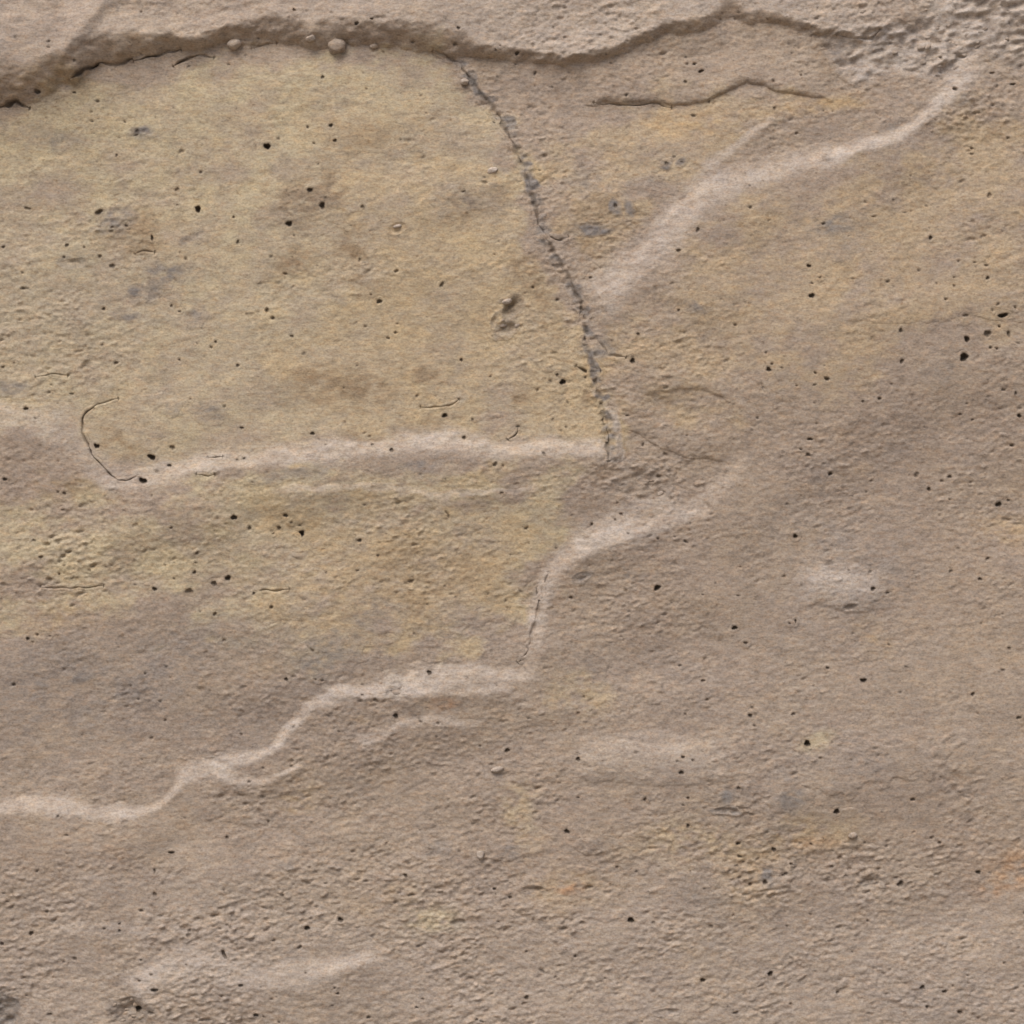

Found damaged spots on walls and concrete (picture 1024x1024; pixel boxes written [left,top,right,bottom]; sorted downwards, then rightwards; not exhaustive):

crack [594,98,671,111]
crack [433,43,626,467]
crack [78,396,138,484]